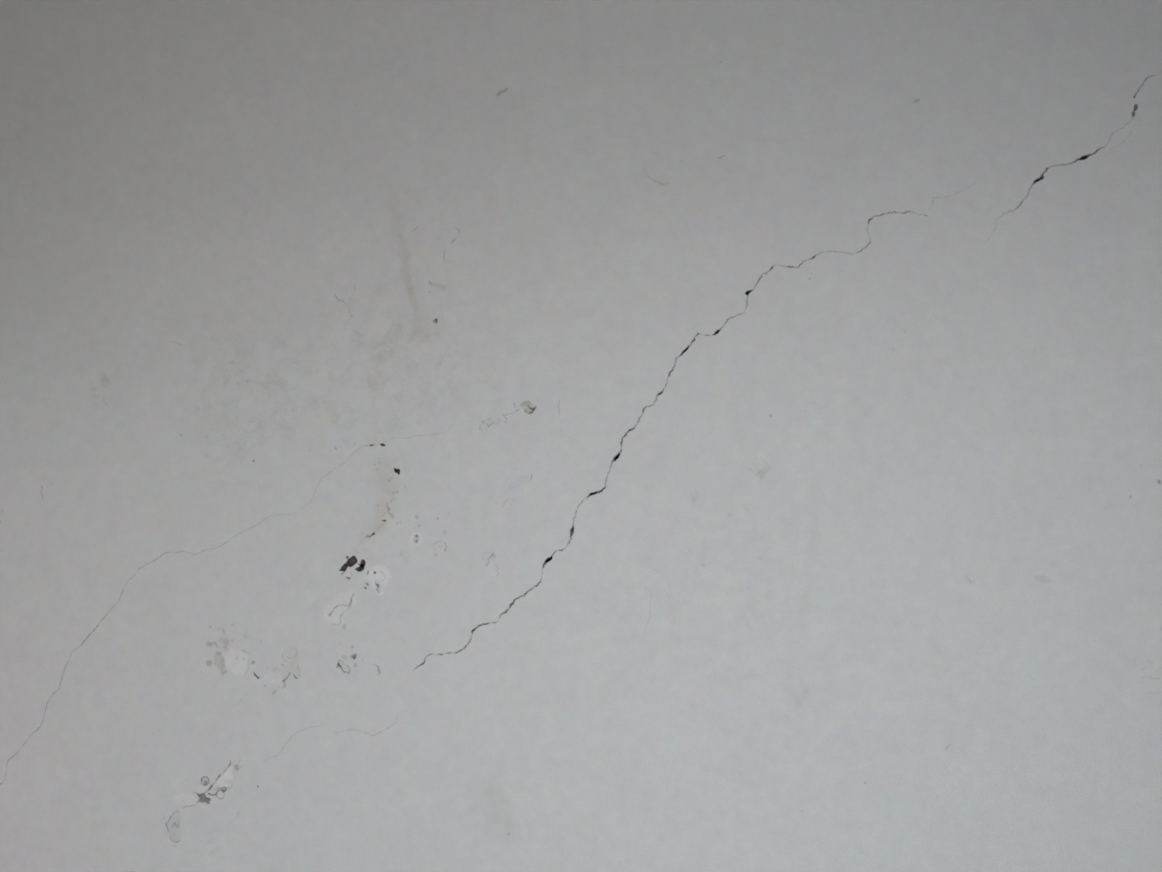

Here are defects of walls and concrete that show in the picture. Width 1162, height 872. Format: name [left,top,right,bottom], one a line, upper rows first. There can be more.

crack [984,74,1157,244]
crack [409,182,977,674]
crack [0,420,475,786]
flaking render [334,551,375,585]
flaking render [335,640,382,676]
flaking render [160,758,244,849]